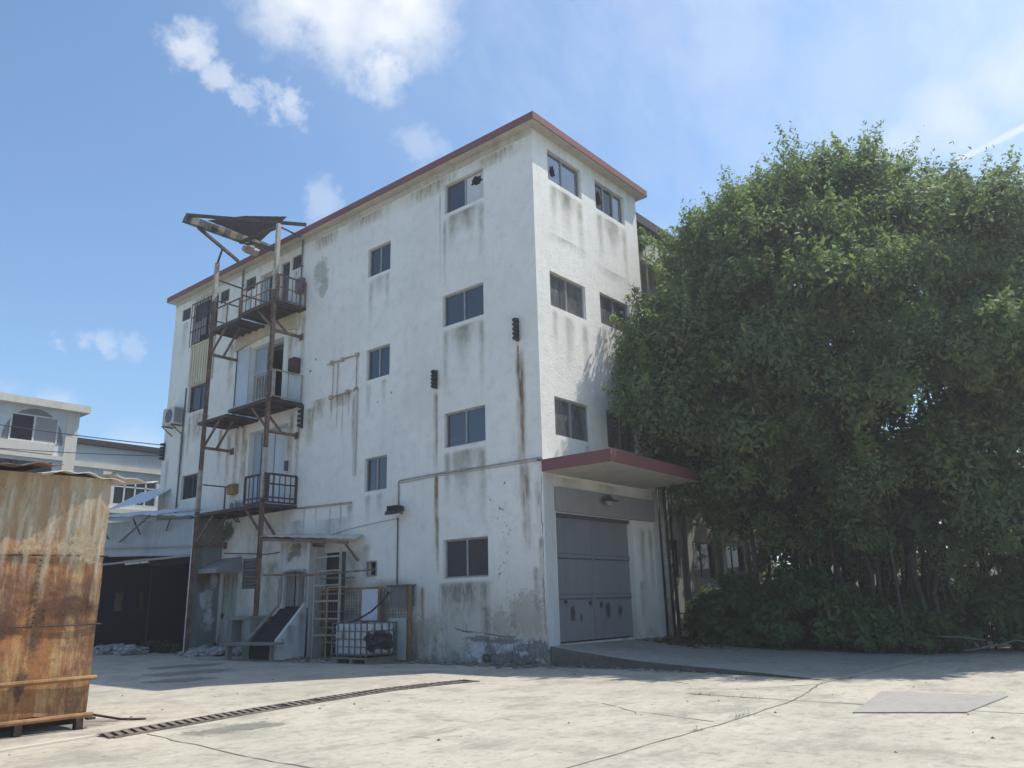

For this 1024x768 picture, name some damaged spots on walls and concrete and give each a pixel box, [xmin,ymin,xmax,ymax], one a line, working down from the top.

corrosion [0,596,93,655]
corrosion [13,668,27,706]